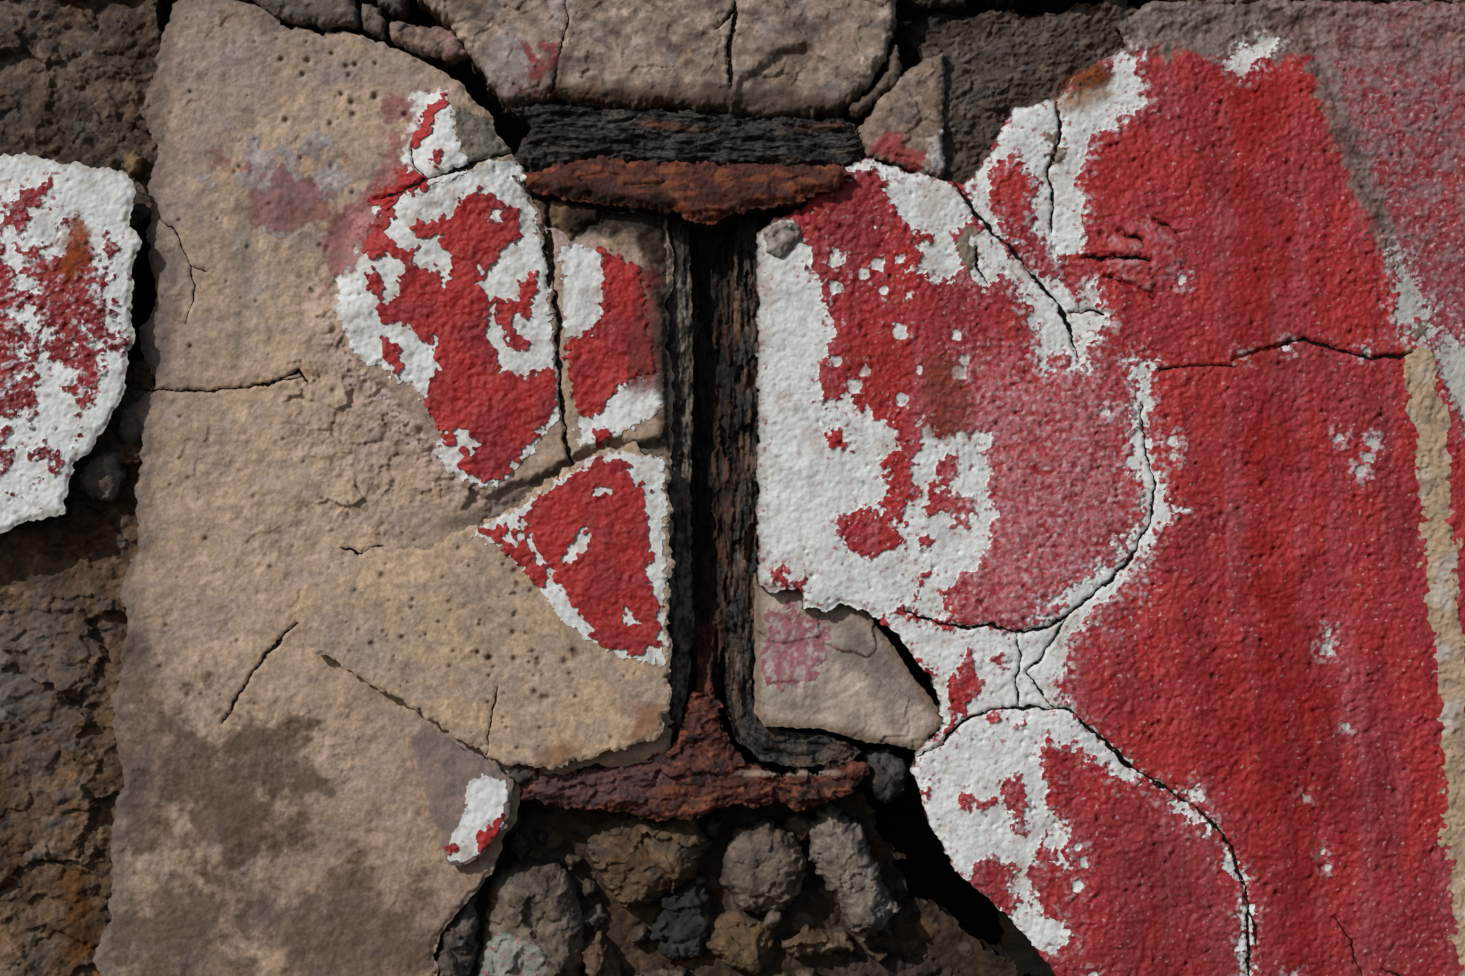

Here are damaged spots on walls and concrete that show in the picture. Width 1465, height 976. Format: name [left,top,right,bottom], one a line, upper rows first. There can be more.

spalling [0,0,171,976]
crack [222,622,298,724]
peeling [332,87,670,667]
crack [541,202,574,469]
crack [716,0,738,87]
peeling [755,0,1258,976]
crack [1046,101,1062,233]
crack [956,183,1177,357]
crack [900,404,1257,976]
peeling [1221,34,1280,82]
peeling [1384,246,1465,976]
spalling [411,724,1030,976]